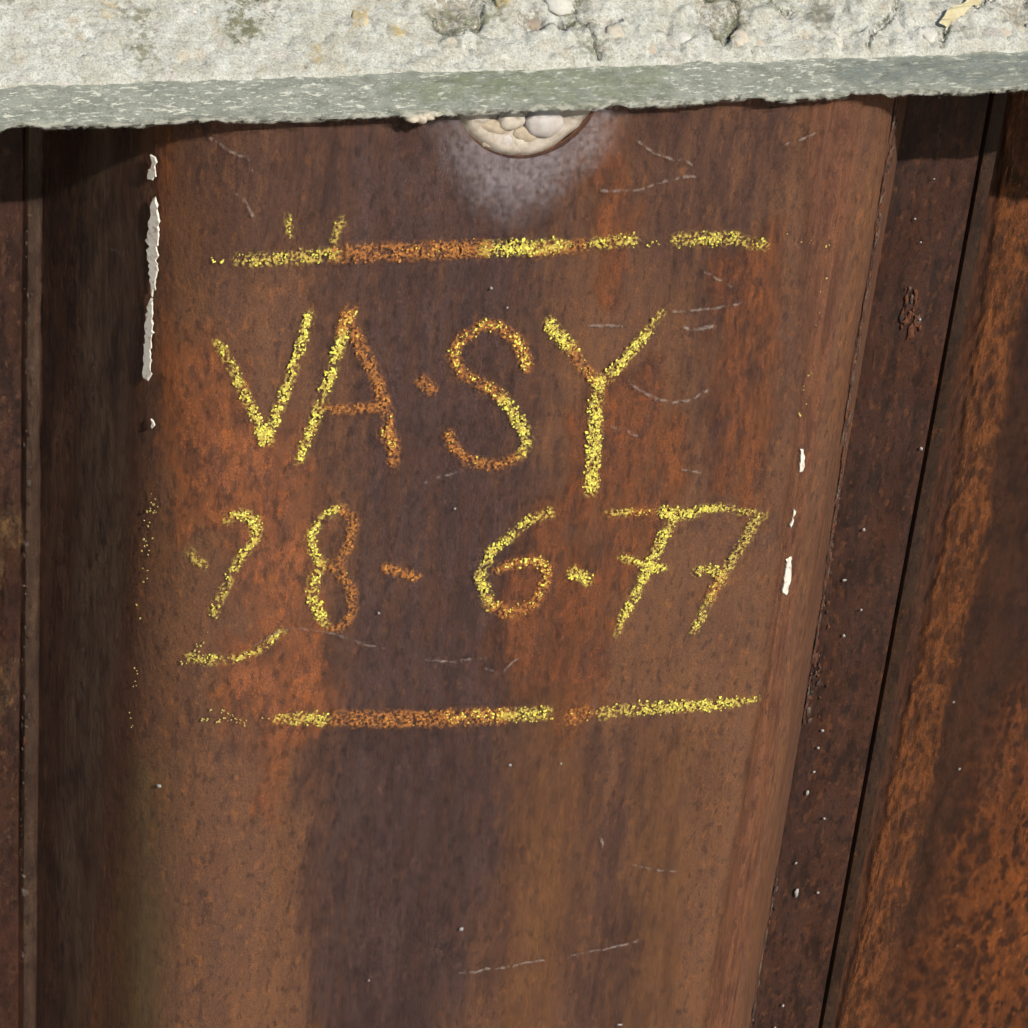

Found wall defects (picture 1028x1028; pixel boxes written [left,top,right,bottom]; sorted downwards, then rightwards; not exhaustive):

damp [529,100,677,111]
corrosion [592,146,634,307]
corrosion [159,348,325,746]
damp [314,110,559,1028]
corrosion [488,362,684,752]
corrosion [707,97,859,1028]
corrosion [839,89,1028,1028]